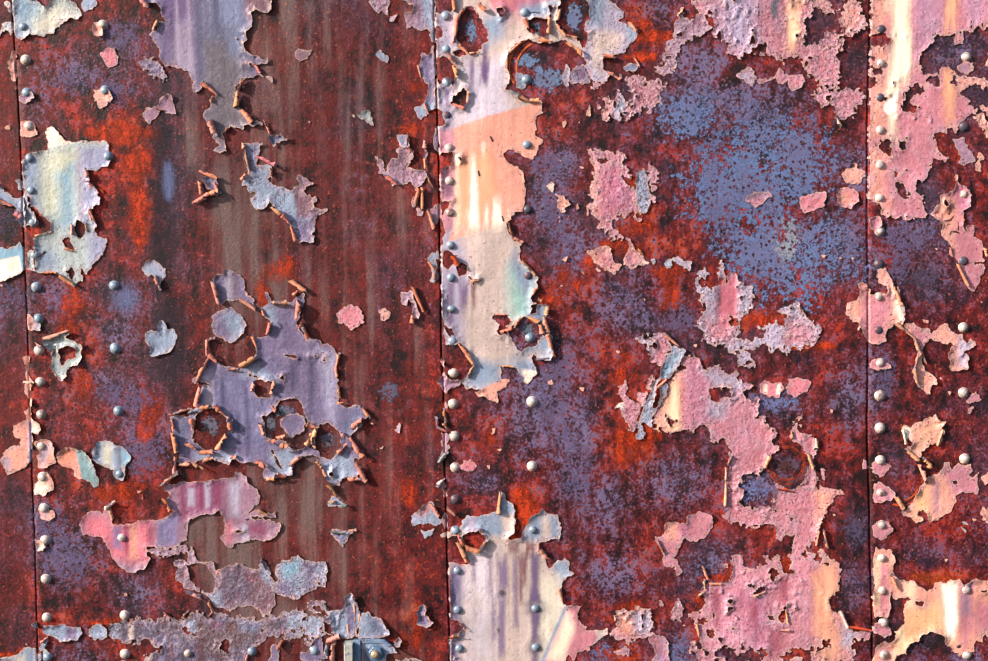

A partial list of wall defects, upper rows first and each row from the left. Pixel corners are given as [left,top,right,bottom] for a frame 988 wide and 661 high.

peeling [0,0,97,40]
peeling [0,121,110,287]
corrosion [84,121,160,247]
peeling [138,0,328,243]
corrosion [599,220,656,253]
peeling [369,0,988,463]
corrosion [201,415,221,436]
peeling [0,269,422,661]
corrosion [508,487,539,540]
corrosion [613,426,662,463]
peeling [411,148,988,661]
corrosion [699,562,732,581]